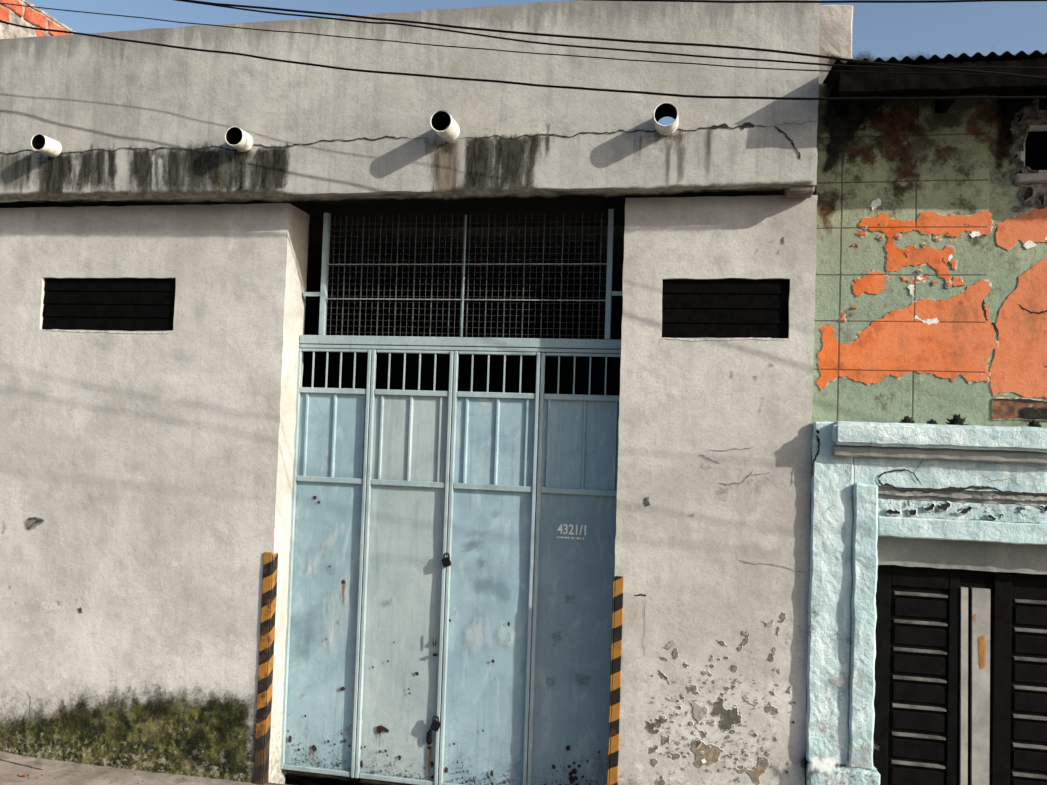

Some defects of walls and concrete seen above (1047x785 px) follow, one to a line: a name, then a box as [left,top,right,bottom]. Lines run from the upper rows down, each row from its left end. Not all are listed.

leakage [822,52,865,173]
leakage [0,147,117,193]
leakage [130,145,289,191]
crack [0,136,428,155]
leakage [426,133,549,191]
crack [459,120,815,159]
peeling [815,99,1047,421]
crack [878,460,1047,497]
peeling [884,500,975,517]
peeling [645,612,797,785]
corrosion [285,725,516,785]
corrosion [540,746,600,785]